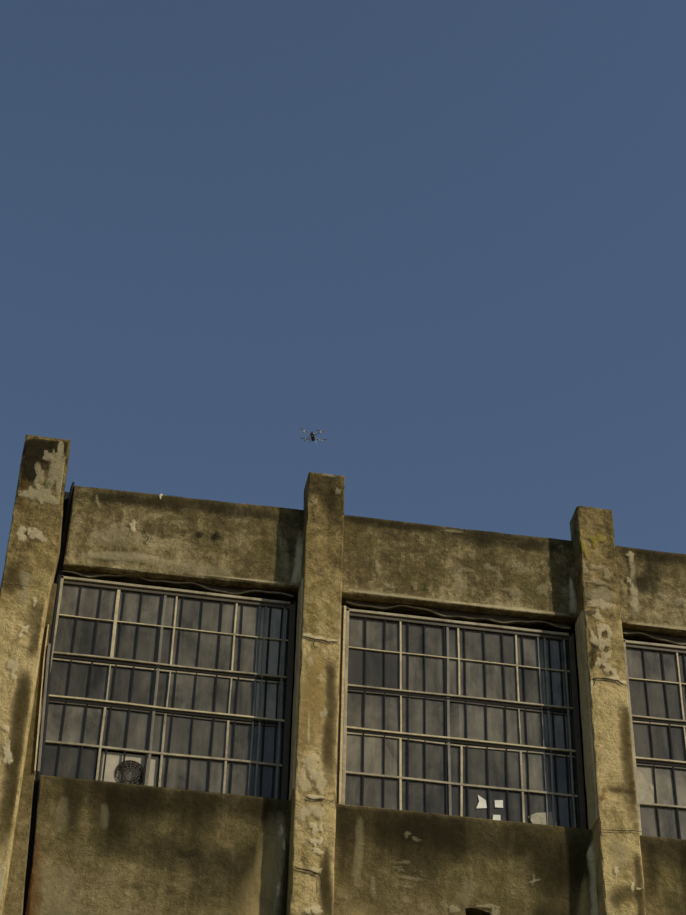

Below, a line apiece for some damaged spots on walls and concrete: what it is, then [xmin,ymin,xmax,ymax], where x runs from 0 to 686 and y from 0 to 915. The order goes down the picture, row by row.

flaking render [19,441,65,505]
flaking render [17,526,45,541]
flaking render [589,642,614,674]
leakage [2,675,30,832]
leakage [244,824,285,915]
leakage [321,853,333,915]
leakage [577,841,598,915]